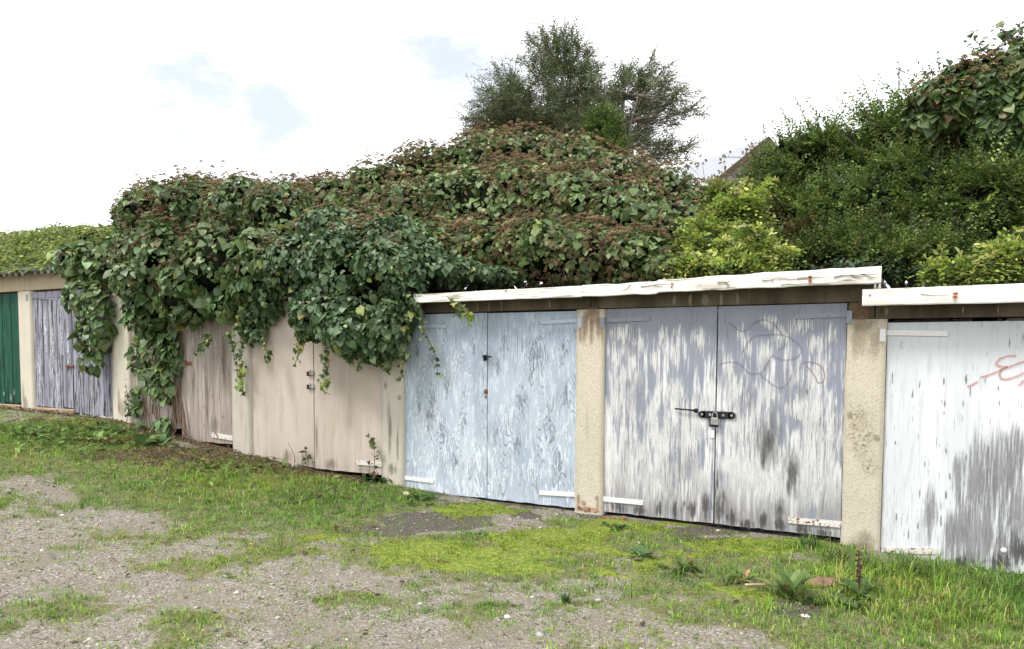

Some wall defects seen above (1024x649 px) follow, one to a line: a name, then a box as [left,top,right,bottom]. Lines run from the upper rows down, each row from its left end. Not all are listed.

water stain [612,422,832,537]
water stain [992,539,1024,569]